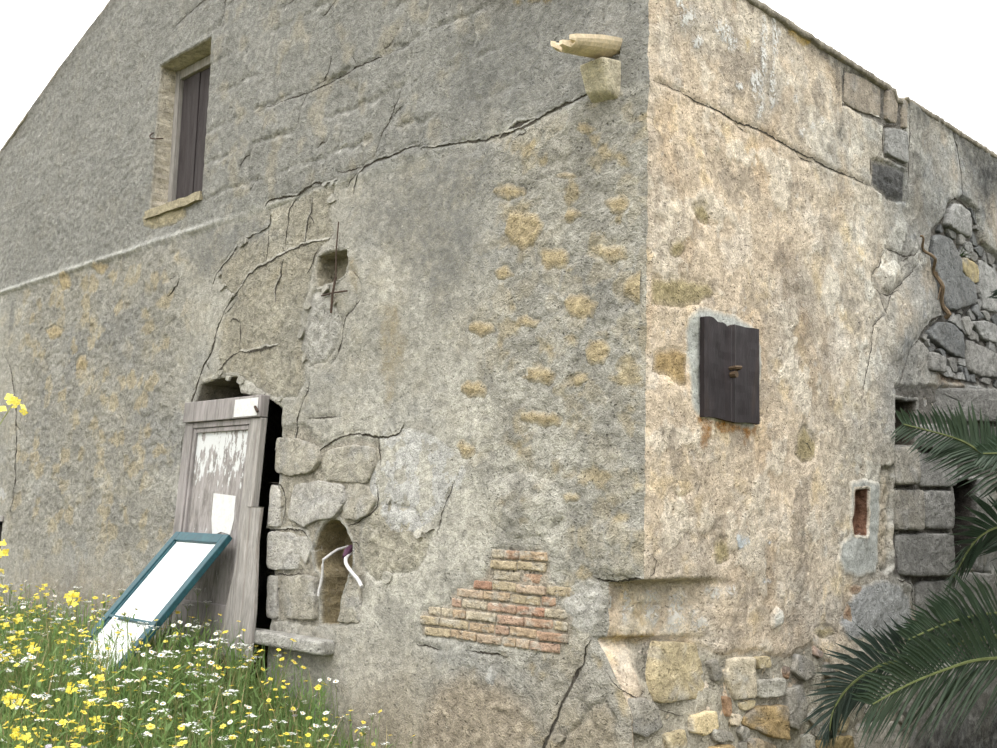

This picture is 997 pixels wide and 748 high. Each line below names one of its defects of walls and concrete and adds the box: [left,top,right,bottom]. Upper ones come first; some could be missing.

crack [657,82,911,204]
crack [935,132,973,233]
crack [181,90,587,452]
crack [863,248,918,396]
crack [899,313,967,384]
crack [275,382,404,547]
spalling [360,498,435,584]
flaking render [420,548,575,655]
crack [540,639,637,748]